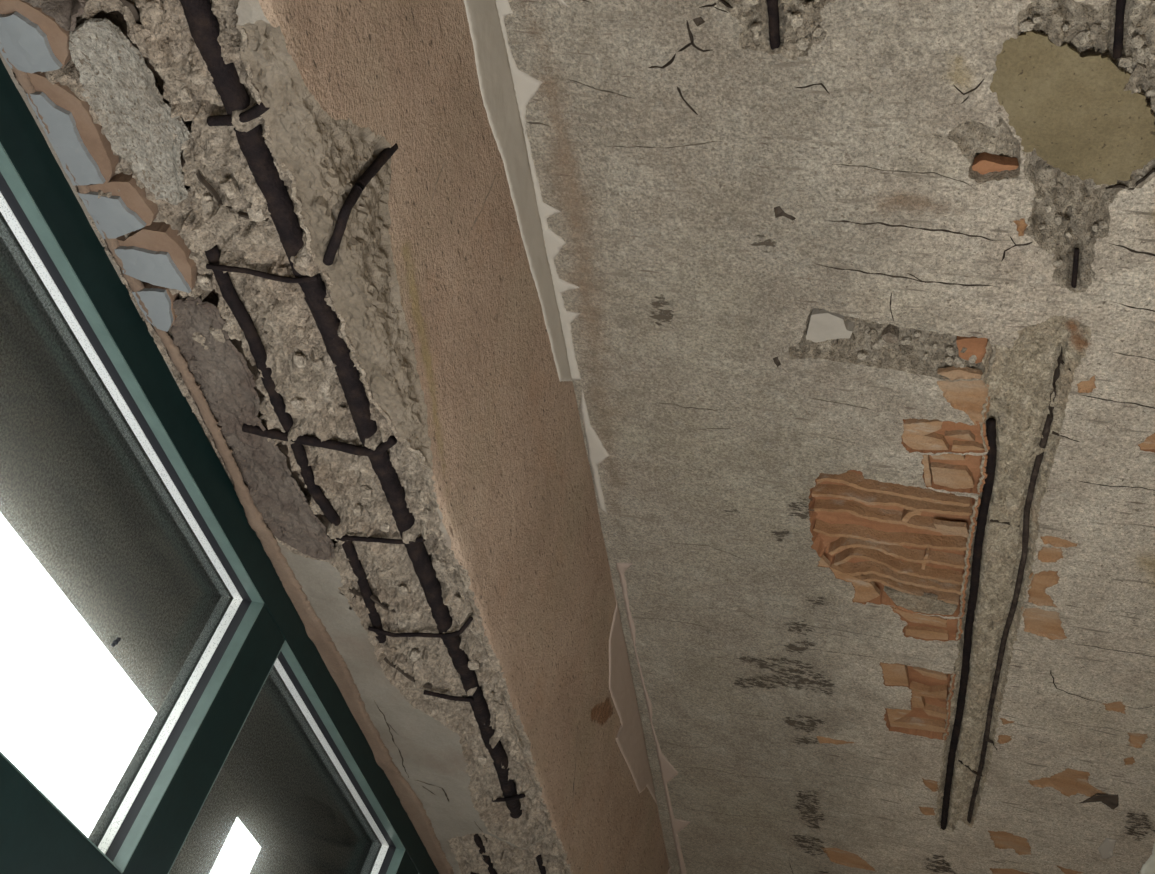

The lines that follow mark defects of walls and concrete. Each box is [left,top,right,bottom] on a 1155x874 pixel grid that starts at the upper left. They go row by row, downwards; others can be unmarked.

spalling [715,0,835,61]
spalling [915,0,1155,293]
peeling [464,0,610,514]
crack [817,220,1032,321]
crack [1109,243,1155,256]
spalling [0,0,573,874]
crack [1048,347,1155,442]
spalling [789,309,1097,832]
peeling [609,563,690,874]
flaking render [1028,768,1119,810]
flaking render [988,830,1032,855]
peeling [1137,843,1155,874]